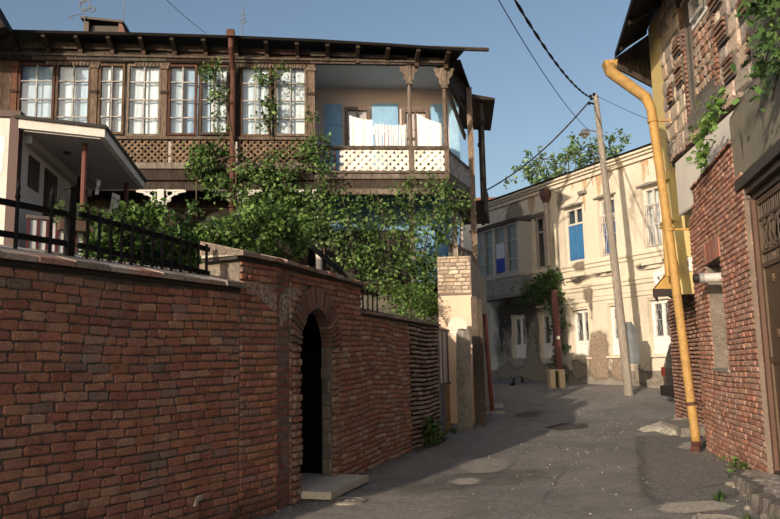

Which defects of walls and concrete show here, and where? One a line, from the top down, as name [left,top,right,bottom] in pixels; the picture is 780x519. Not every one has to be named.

water stain [495,299,542,363]
flaking render [497,331,623,382]